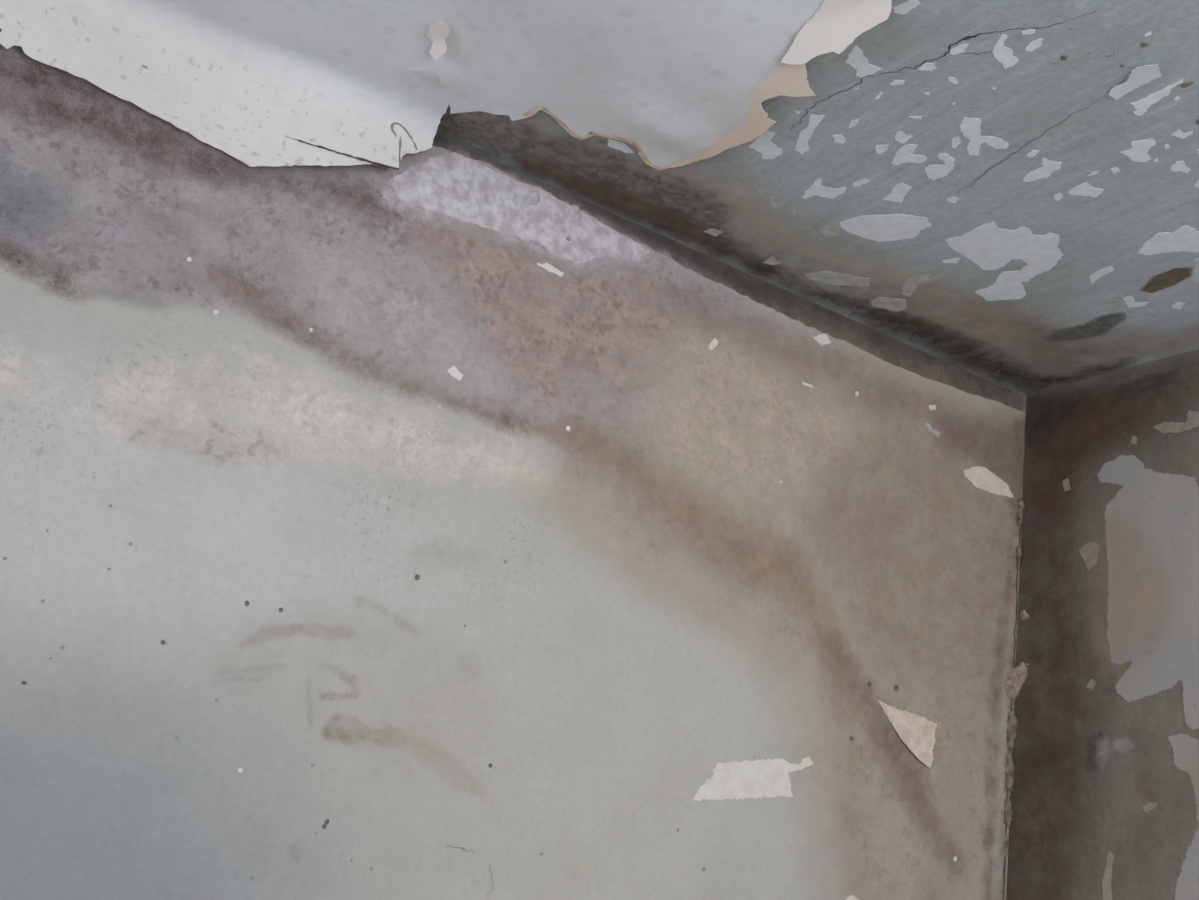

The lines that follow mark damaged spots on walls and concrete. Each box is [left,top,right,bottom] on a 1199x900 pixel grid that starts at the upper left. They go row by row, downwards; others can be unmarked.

peeling [845,45,882,90]
peeling [992,29,1043,69]
peeling [1108,64,1183,116]
peeling [748,110,825,159]
peeling [875,117,1009,181]
peeling [1054,129,1199,201]
peeling [820,183,932,242]
peeling [942,222,1063,301]
peeling [1137,225,1199,283]
peeling [805,271,930,312]
crack [1002,415,1029,900]
peeling [1079,435,1199,900]